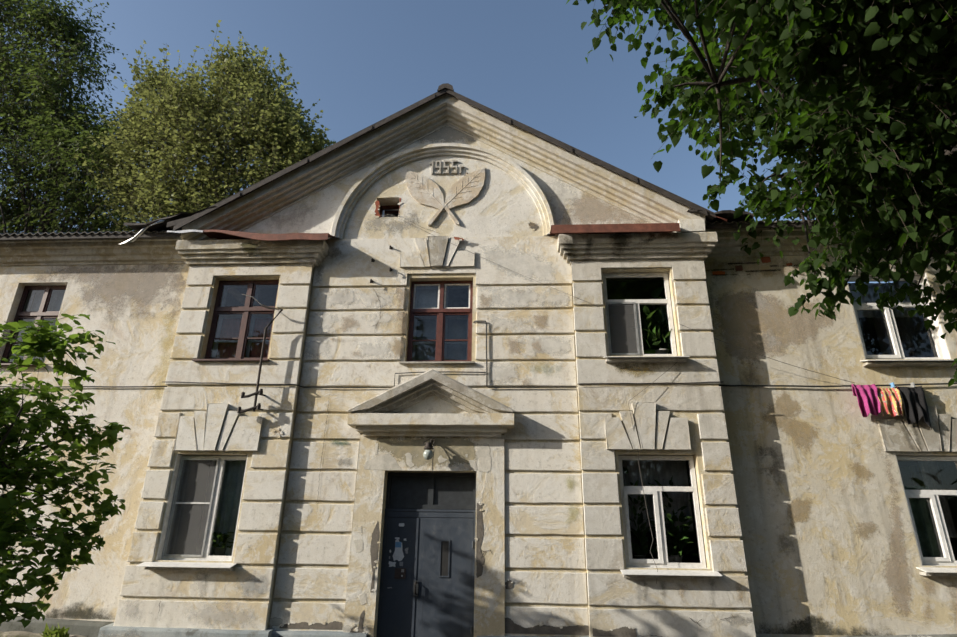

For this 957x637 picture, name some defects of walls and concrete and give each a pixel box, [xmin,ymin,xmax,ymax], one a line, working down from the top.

flaking render [705,256,799,276]
spalling [475,502,485,577]
spalling [269,522,381,633]
spalling [505,616,637,637]